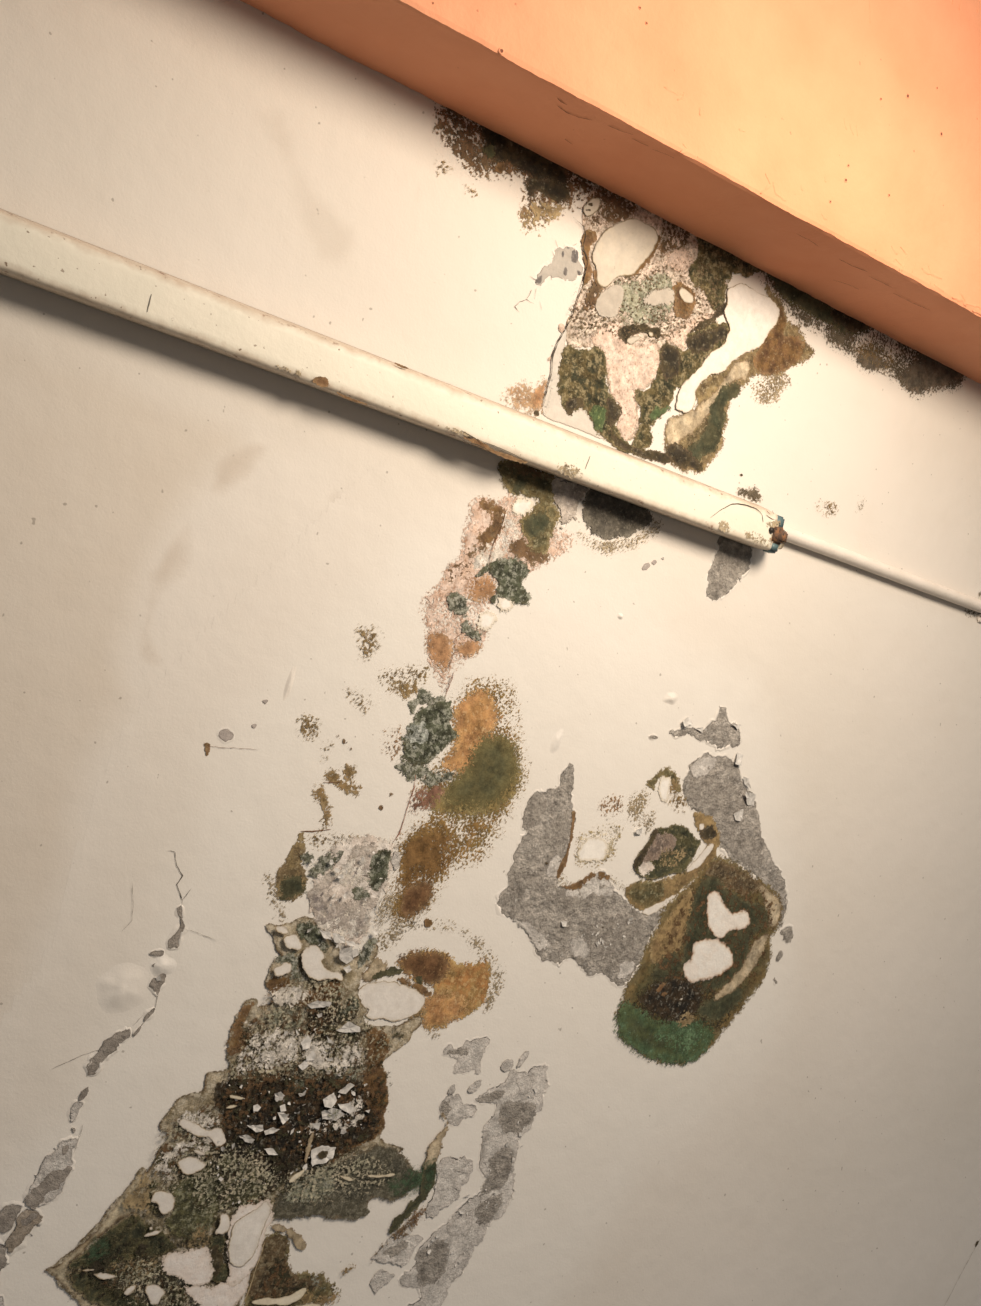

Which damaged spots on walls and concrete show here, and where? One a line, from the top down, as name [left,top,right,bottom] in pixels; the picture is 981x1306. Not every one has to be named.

mould [432,103,598,236]
flaking render [533,185,815,475]
mould [756,272,966,400]
flaking render [703,535,755,604]
water stain [0,287,840,1306]
flaking render [495,763,665,989]
flaking render [648,705,794,985]
peeling [370,1035,551,1306]